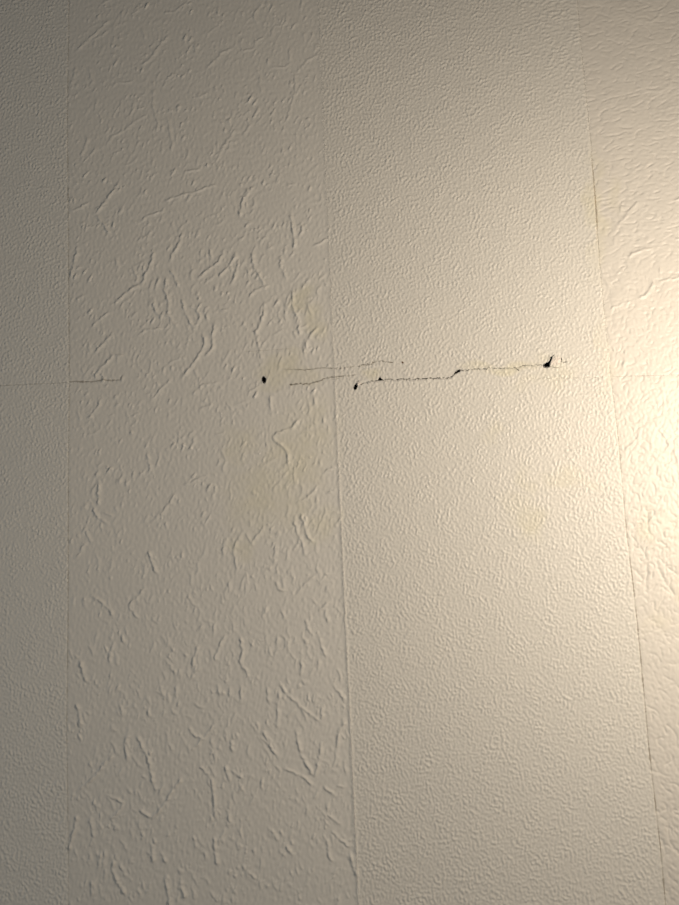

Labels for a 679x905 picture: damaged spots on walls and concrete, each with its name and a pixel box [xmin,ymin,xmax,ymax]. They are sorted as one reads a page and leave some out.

crack [290,355,562,390]